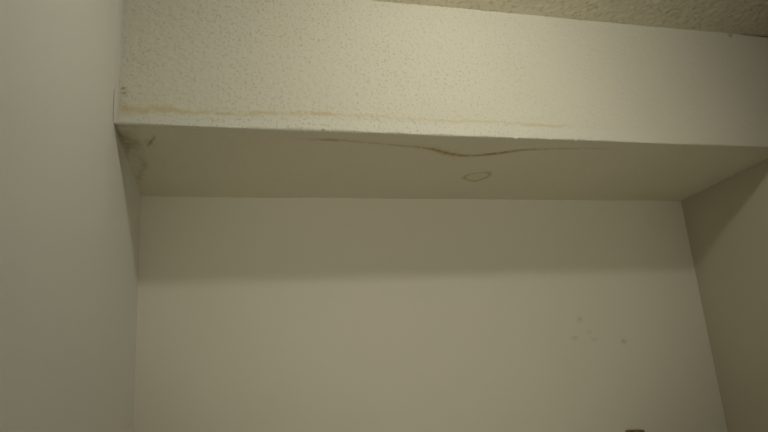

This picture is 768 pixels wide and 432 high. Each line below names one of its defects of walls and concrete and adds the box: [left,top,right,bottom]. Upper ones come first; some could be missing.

damp [115,86,576,185]
damp [286,136,644,158]